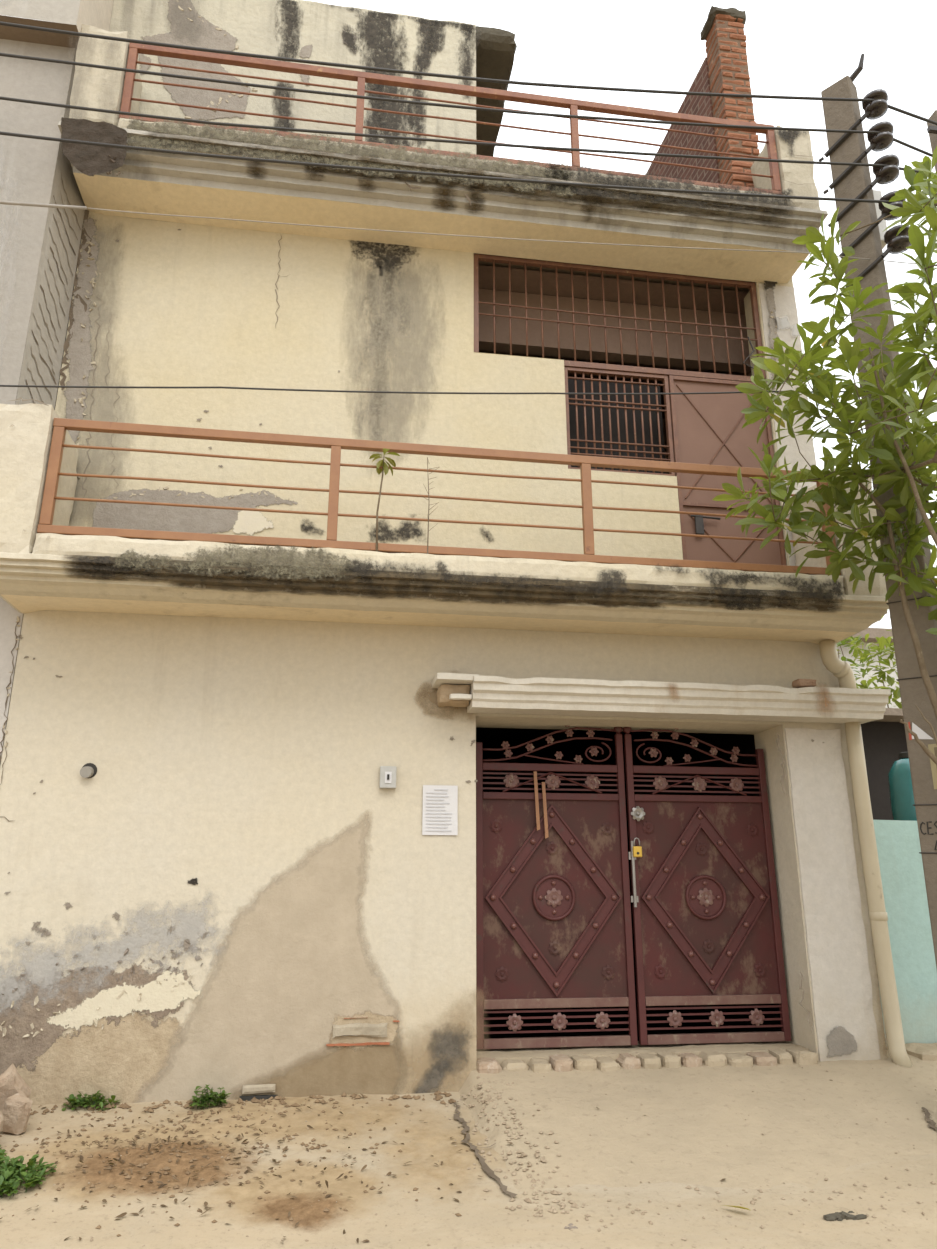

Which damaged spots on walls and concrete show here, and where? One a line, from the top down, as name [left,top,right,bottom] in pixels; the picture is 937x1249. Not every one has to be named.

peeling [138,0,257,120]
leakage [248,0,792,226]
spalling [61,117,127,176]
leakage [352,240,416,271]
peeling [92,487,298,536]
leakage [67,555,845,612]
crack [0,616,20,783]
peeling [0,900,216,1105]
crack [921,1107,937,1130]